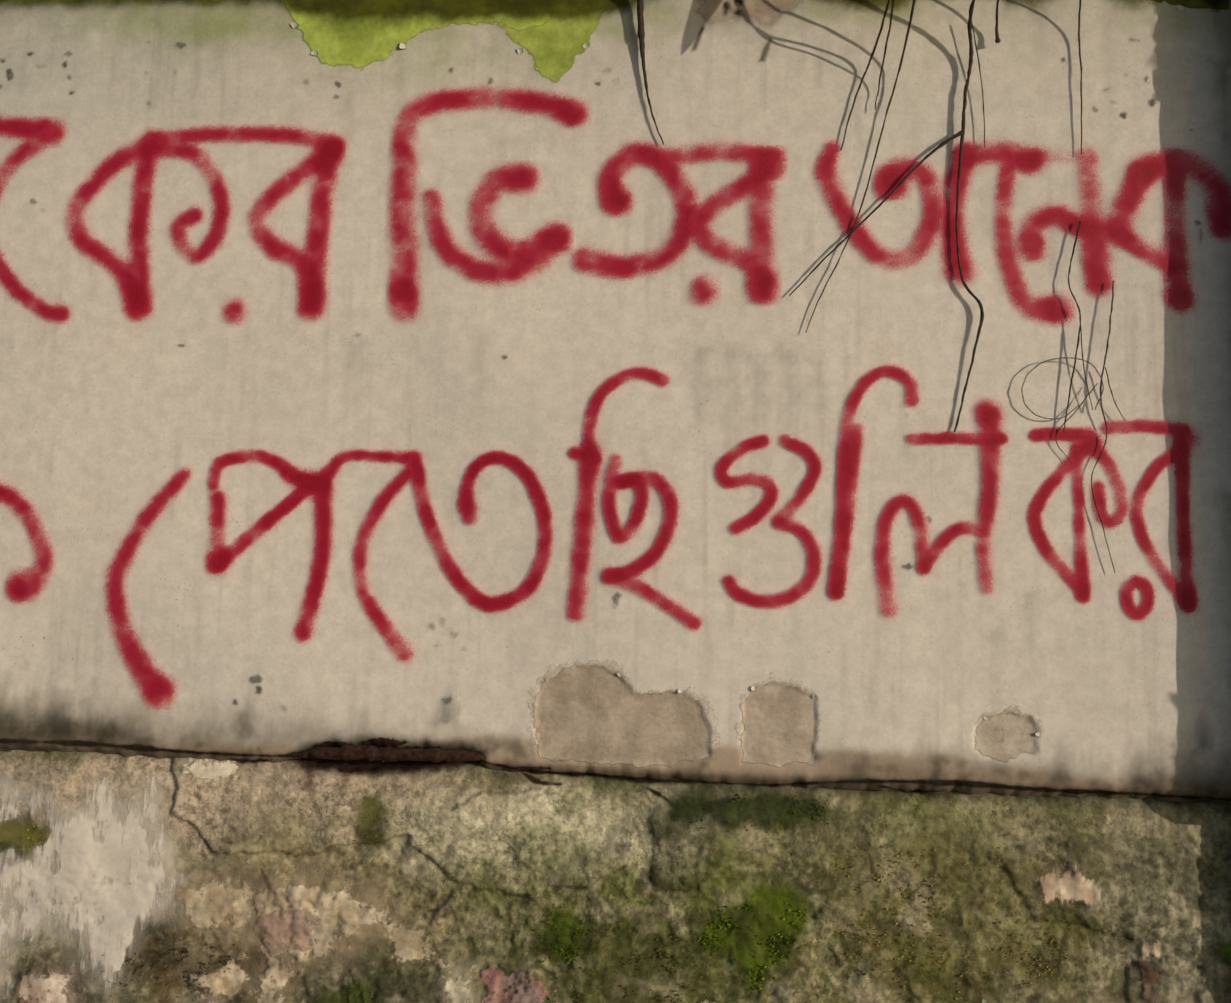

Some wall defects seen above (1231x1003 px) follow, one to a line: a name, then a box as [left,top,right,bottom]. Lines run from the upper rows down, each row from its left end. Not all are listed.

peeling [286,6,604,83]
flaking render [694,0,796,61]
leakage [0,714,149,746]
rust [291,737,486,775]
flaking render [527,660,720,768]
flaking render [735,672,820,768]
flaking render [975,706,1045,762]
peeling [1037,865,1106,909]
peeling [1142,941,1164,959]